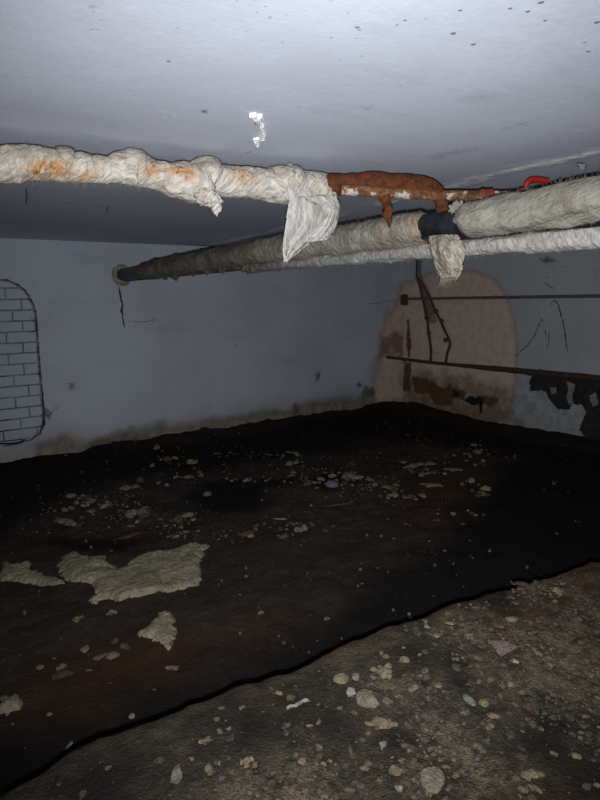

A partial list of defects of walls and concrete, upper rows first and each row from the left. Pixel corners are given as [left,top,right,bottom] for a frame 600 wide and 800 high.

crack [118,285,156,328]
flaking render [358,271,600,440]
crack [515,282,568,358]
damp [38,394,375,456]